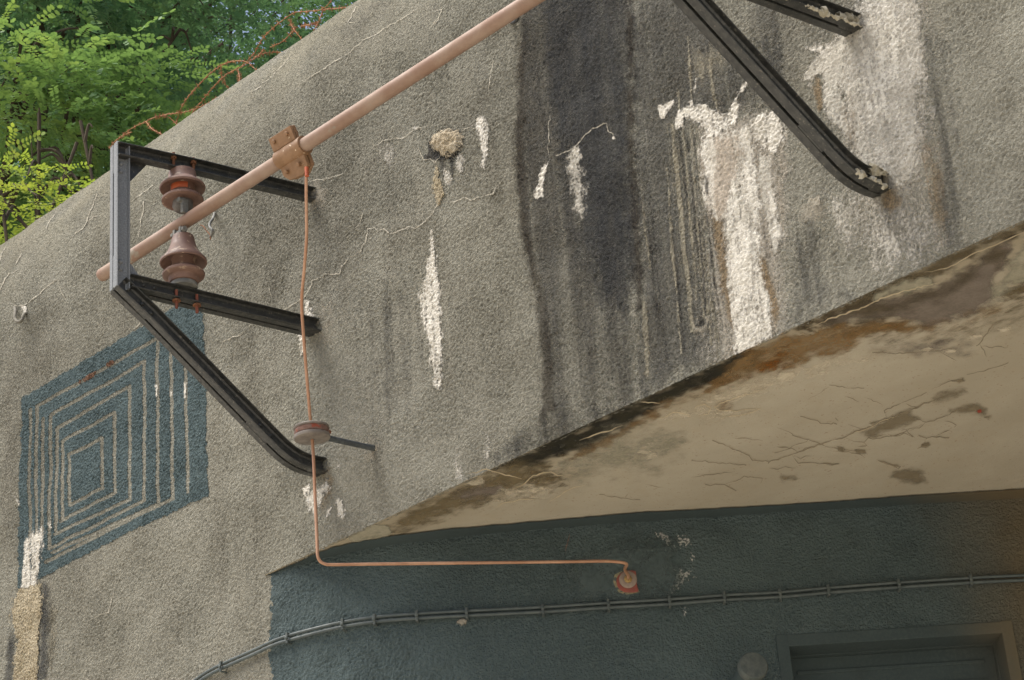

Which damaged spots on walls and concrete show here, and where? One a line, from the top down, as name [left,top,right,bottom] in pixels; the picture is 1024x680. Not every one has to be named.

efflorescence [476,116,489,168]
crack [534,120,615,213]
water stain [517,0,651,348]
water stain [658,0,1024,358]
efflorescence [417,230,443,389]
water stain [642,301,659,377]
crack [691,324,1008,491]
water stain [866,391,990,437]
water stain [391,433,684,534]
water stain [878,460,924,483]